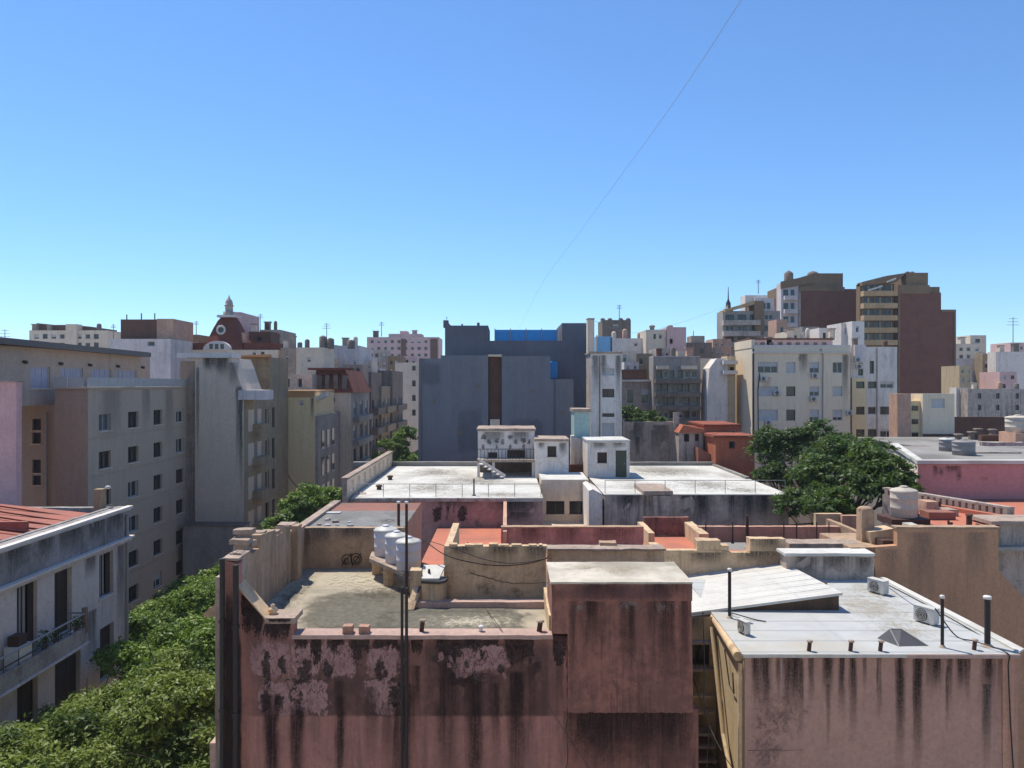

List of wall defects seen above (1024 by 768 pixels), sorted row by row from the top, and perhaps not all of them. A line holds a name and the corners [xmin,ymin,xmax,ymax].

peeling [248,639,405,718]
water stain [225,587,534,768]
peeling [431,642,478,678]
water stain [553,601,595,672]
water stain [754,658,878,687]
water stain [896,658,970,709]
water stain [577,712,686,743]